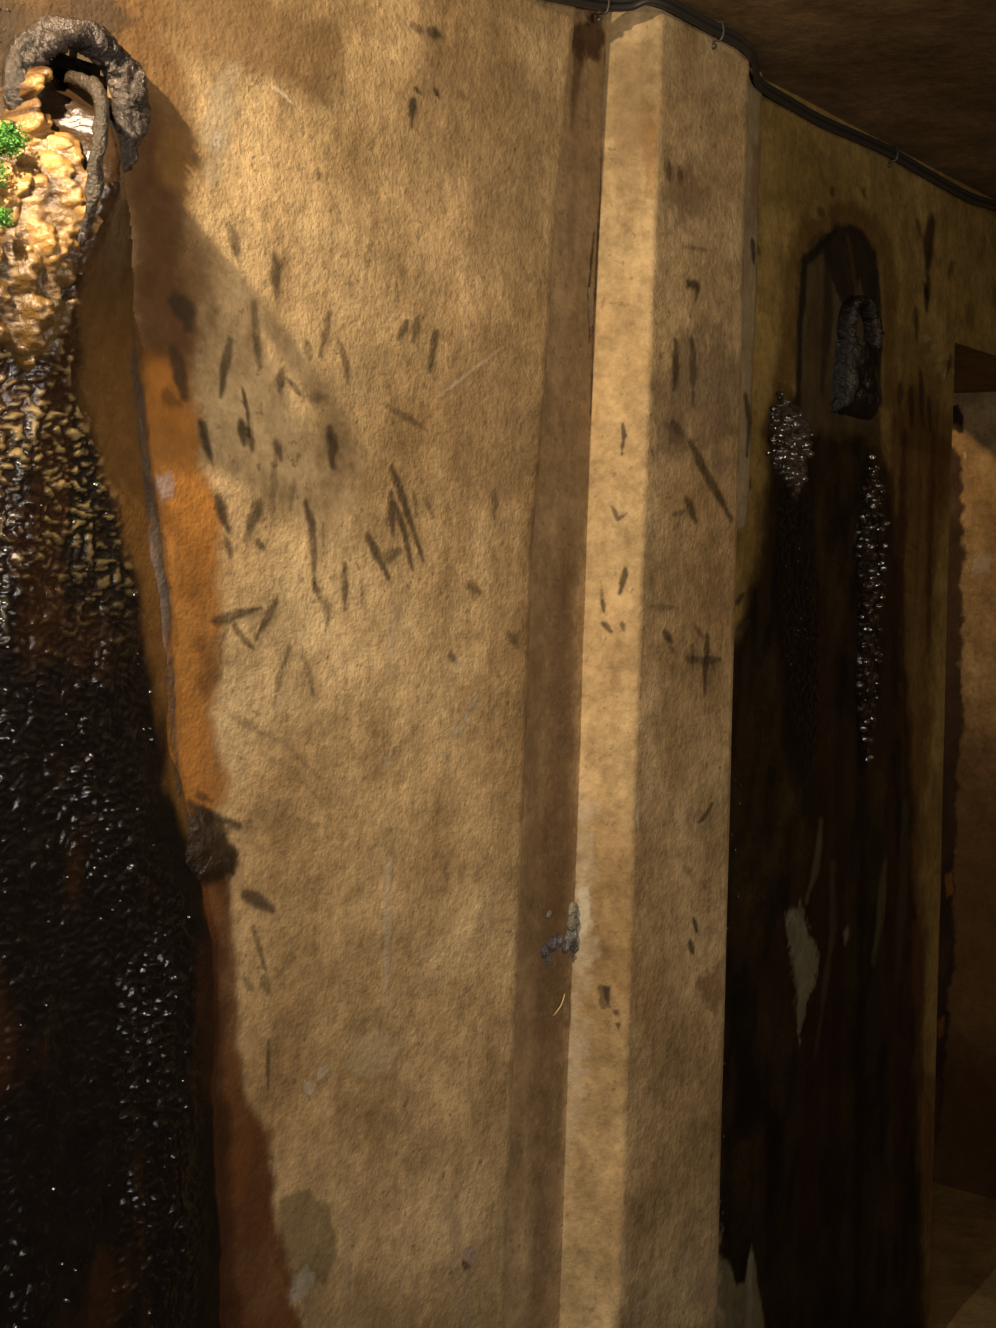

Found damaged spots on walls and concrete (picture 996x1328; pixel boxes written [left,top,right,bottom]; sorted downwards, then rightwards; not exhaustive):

damp [172,348,186,399]
rust [95,0,224,815]
damp [199,420,212,460]
damp [239,391,254,446]
damp [215,495,230,532]
damp [246,501,263,547]
damp [212,601,277,638]
damp [187,801,242,827]
damp [704,400,996,1328]